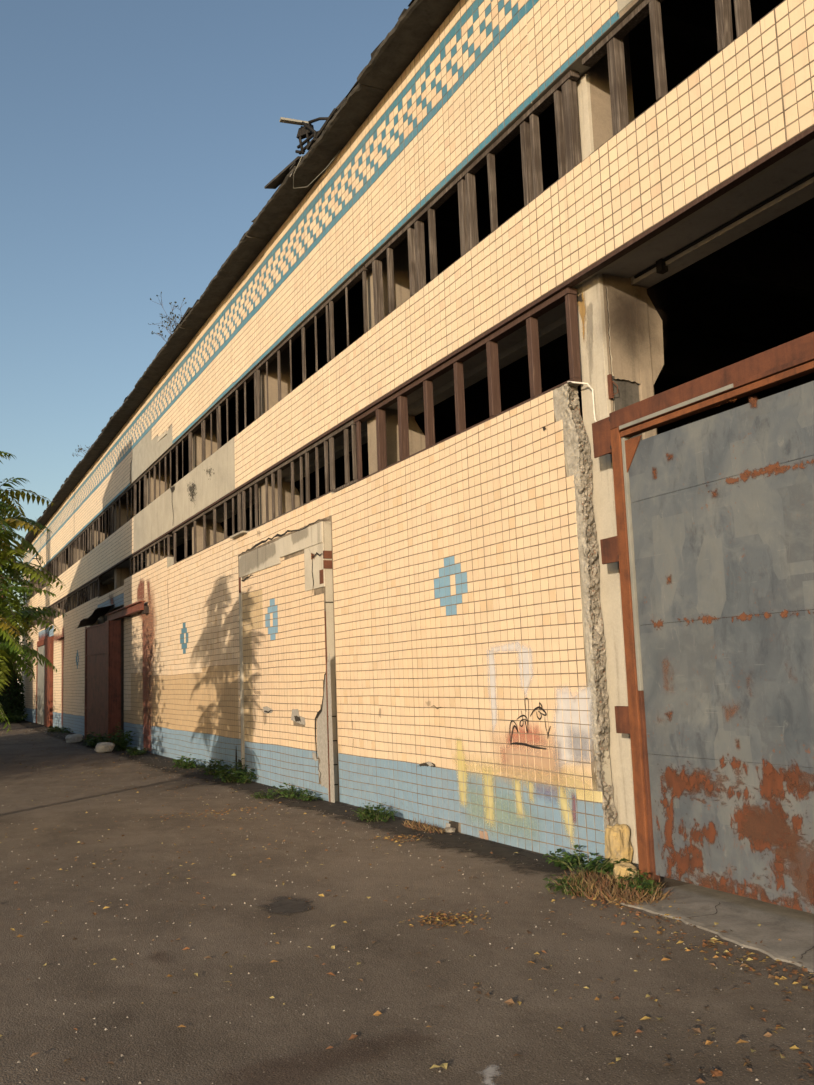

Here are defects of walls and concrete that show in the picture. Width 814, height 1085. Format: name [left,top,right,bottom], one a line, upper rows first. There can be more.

corrosion [708,459,814,497]
spalling [550,382,617,833]
spalling [291,654,335,803]
corrosion [656,741,814,911]